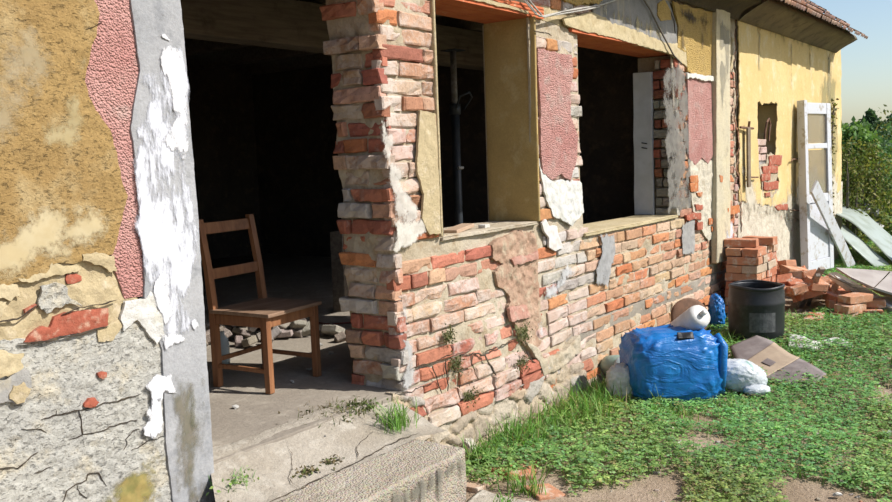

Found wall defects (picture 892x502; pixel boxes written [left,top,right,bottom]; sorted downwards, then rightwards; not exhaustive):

peeling [657,0,676,33]
peeling [135,34,199,350]
spalling [684,175,714,232]
spalling [759,153,788,211]
spalling [0,252,137,405]
crack [24,394,162,450]
crack [0,452,49,473]
crack [62,472,107,502]
crack [270,433,415,502]